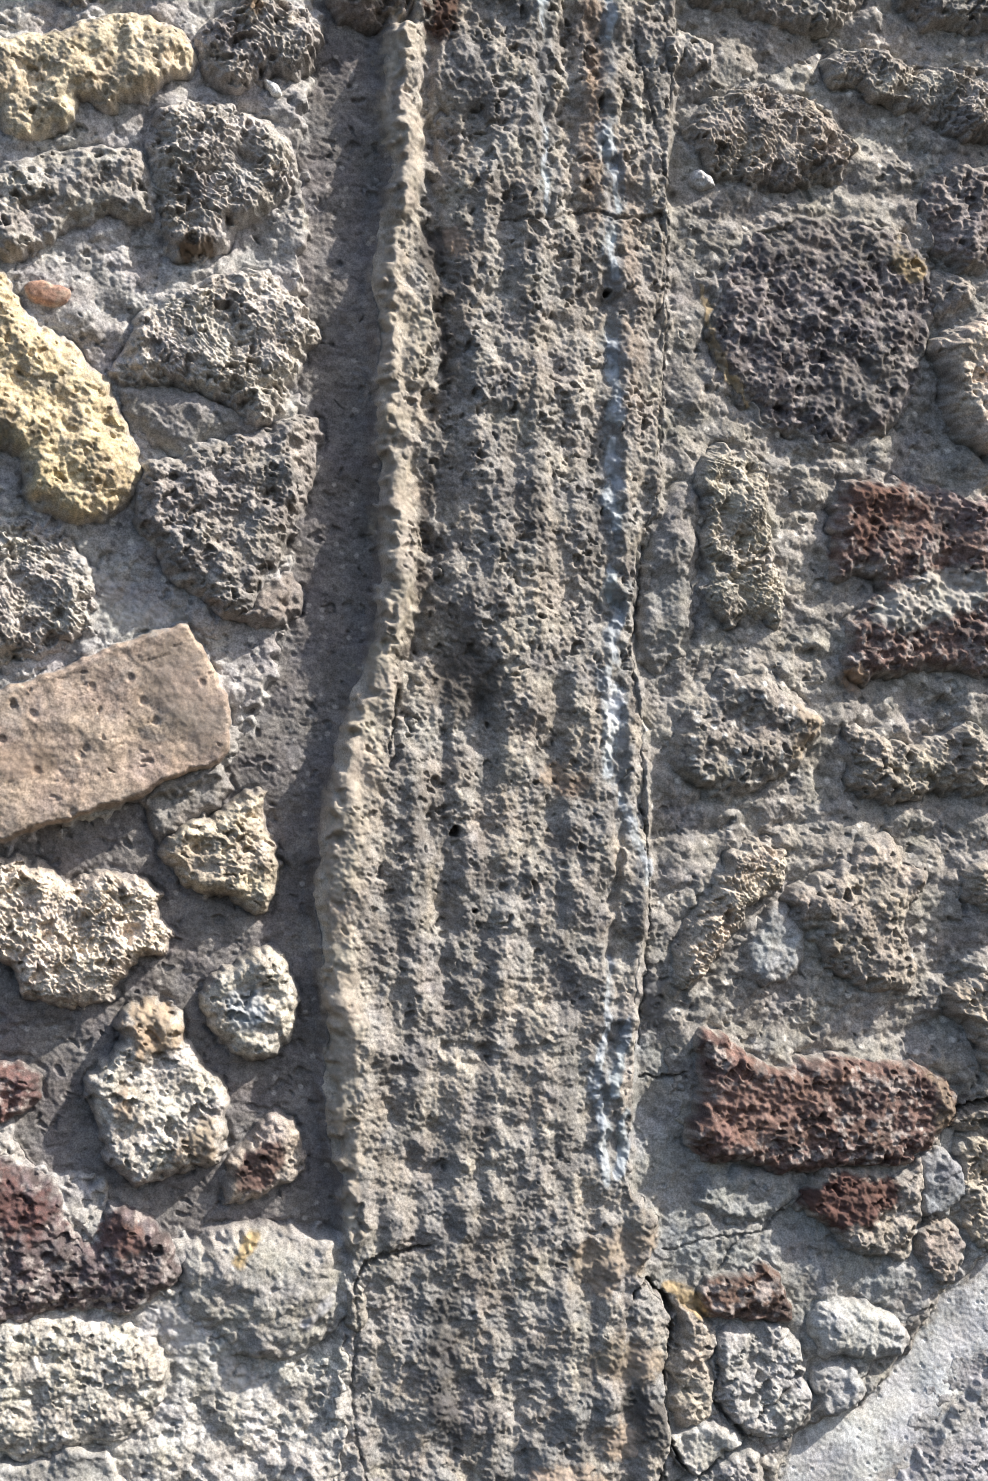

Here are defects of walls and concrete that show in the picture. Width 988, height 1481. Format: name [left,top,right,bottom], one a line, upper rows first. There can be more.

crack [633,1276,670,1375]
crack [671,1440,685,1467]